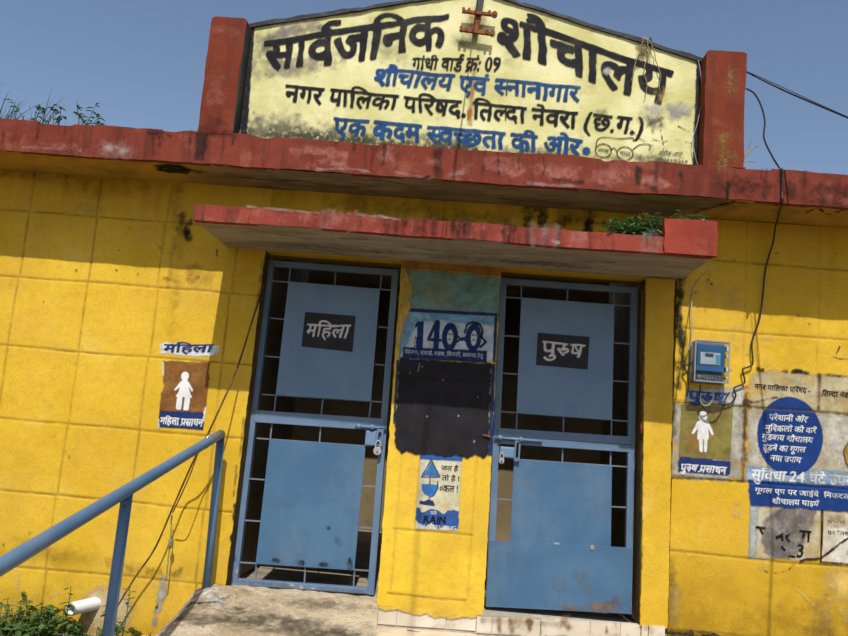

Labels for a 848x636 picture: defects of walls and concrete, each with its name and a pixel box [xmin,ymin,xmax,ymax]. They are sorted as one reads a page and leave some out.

leakage [195,132,208,159]
leakage [247,116,478,171]
leakage [155,164,201,174]
leakage [674,277,687,389]
crack [764,538,848,573]